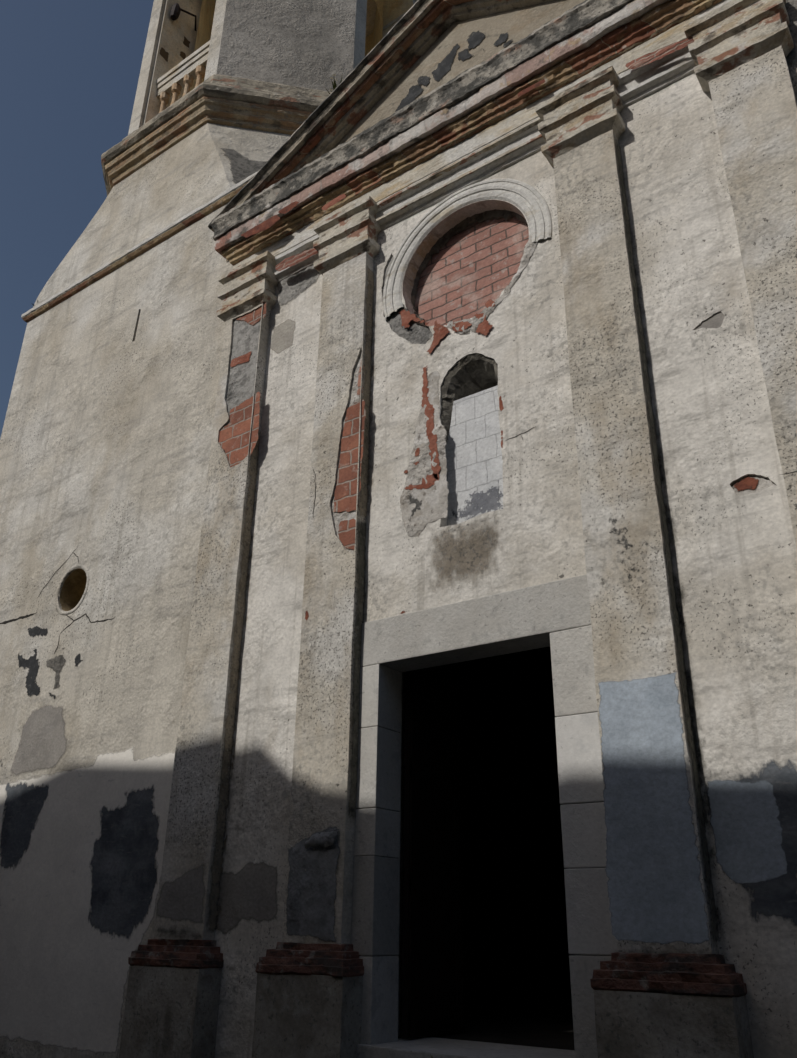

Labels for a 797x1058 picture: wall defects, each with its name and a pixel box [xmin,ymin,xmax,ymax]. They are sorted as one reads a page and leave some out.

flaking render [395,31,513,112]
spalling [386,209,538,354]
spalling [219,248,319,467]
spalling [331,351,366,554]
spalling [400,367,449,537]
water stain [433,480,503,581]
spalling [731,475,776,496]
crack [55,614,114,652]